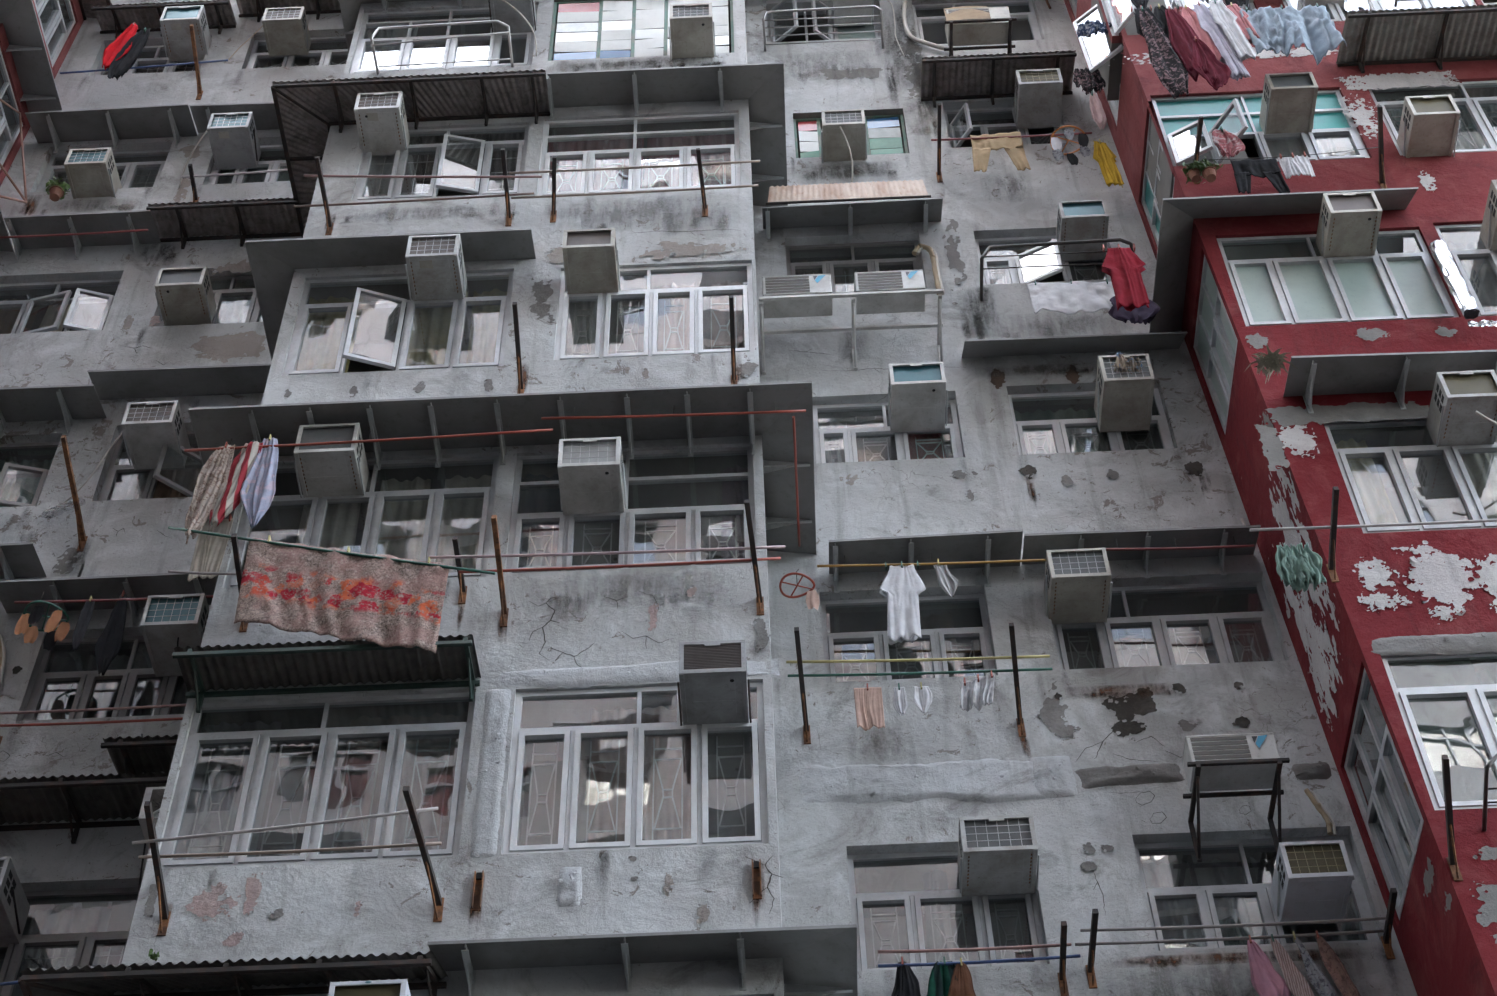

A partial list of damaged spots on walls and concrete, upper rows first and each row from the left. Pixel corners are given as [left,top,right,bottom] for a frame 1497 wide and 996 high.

peeling [1334,70,1463,139]
peeling [1254,401,1429,559]
peeling [1352,540,1497,624]
crack [529,591,673,667]
peeling [1283,573,1343,731]
peeling [185,872,284,947]
peeling [1423,857,1452,913]
peeling [1469,881,1497,944]
peeling [1473,846,1497,860]